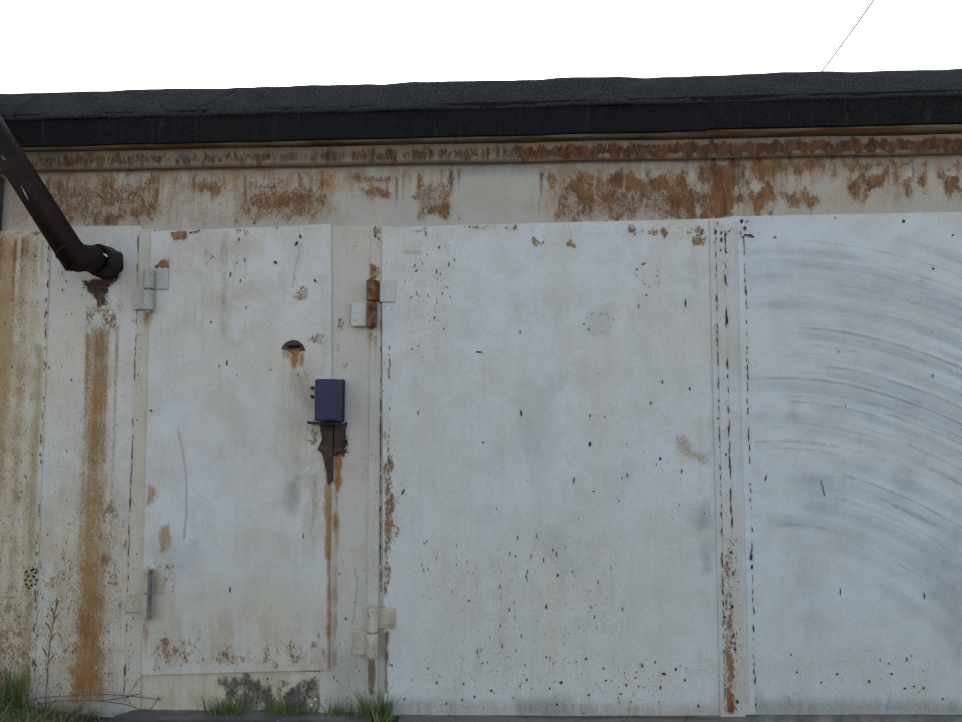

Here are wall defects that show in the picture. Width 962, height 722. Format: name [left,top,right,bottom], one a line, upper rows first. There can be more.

rust [32,135,962,265]
rust [283,349,303,367]
rust [55,276,130,696]
rust [153,422,349,681]
rust [383,450,399,594]
water stain [219,673,327,712]
rust [723,548,739,713]